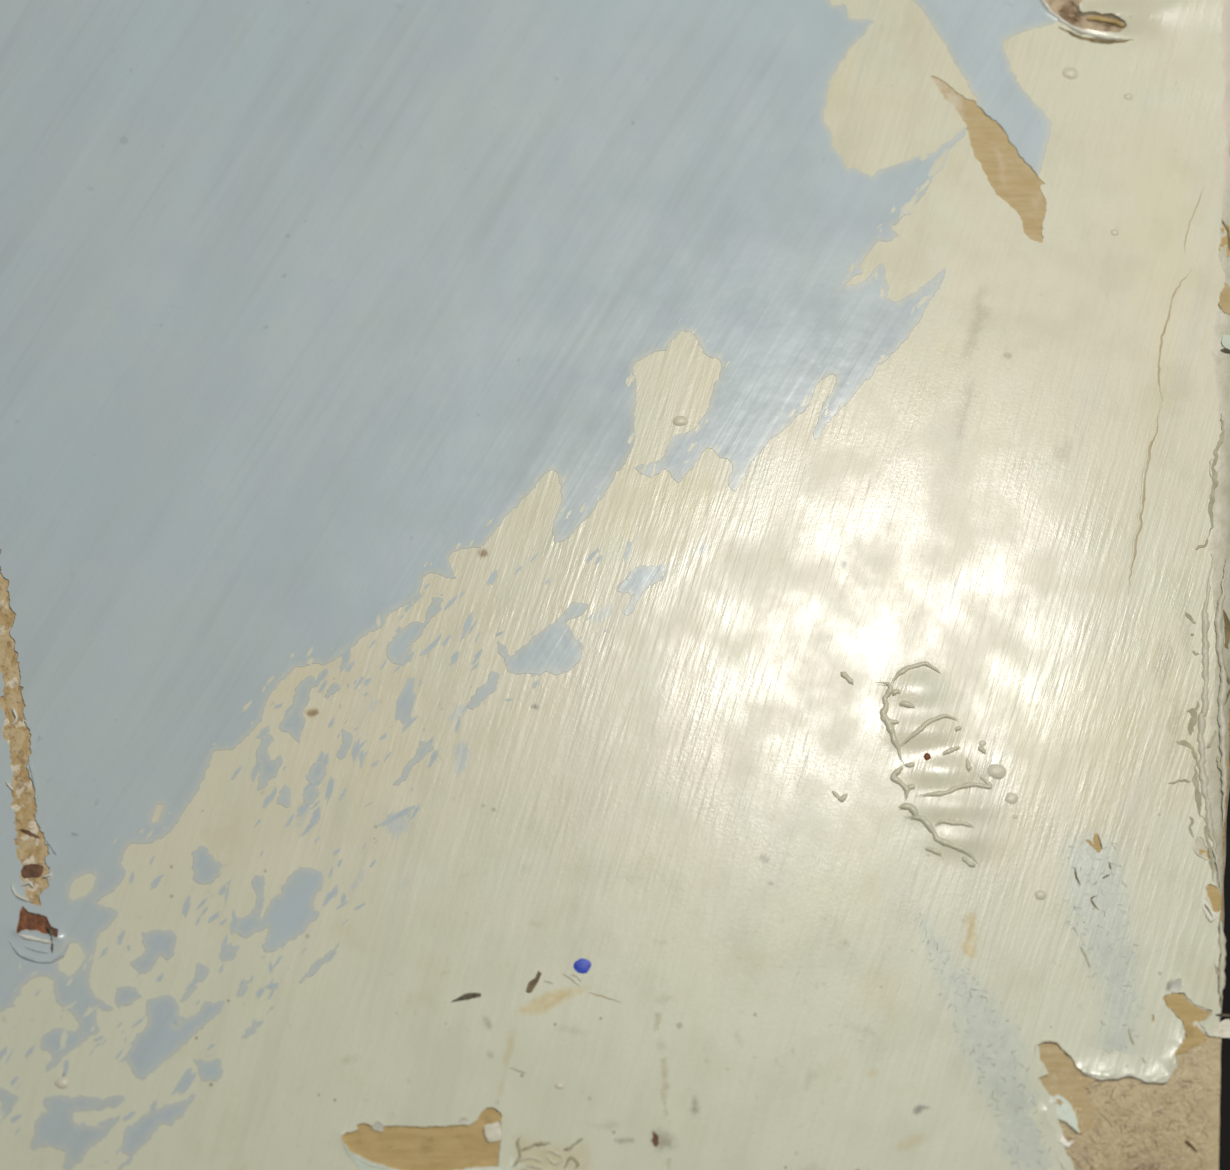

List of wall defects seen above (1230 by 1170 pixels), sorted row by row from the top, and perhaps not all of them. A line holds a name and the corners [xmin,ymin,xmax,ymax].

spalling [1040,0,1134,44]
peeling [824,0,1046,243]
peeling [1219,219,1230,257]
peeling [1219,283,1230,314]
peeling [9,541,678,1080]
peeling [1086,833,1103,853]
peeling [1201,884,1221,921]
peeling [1034,978,1230,1170]
peeling [0,1044,224,1170]
peeling [342,1107,510,1170]